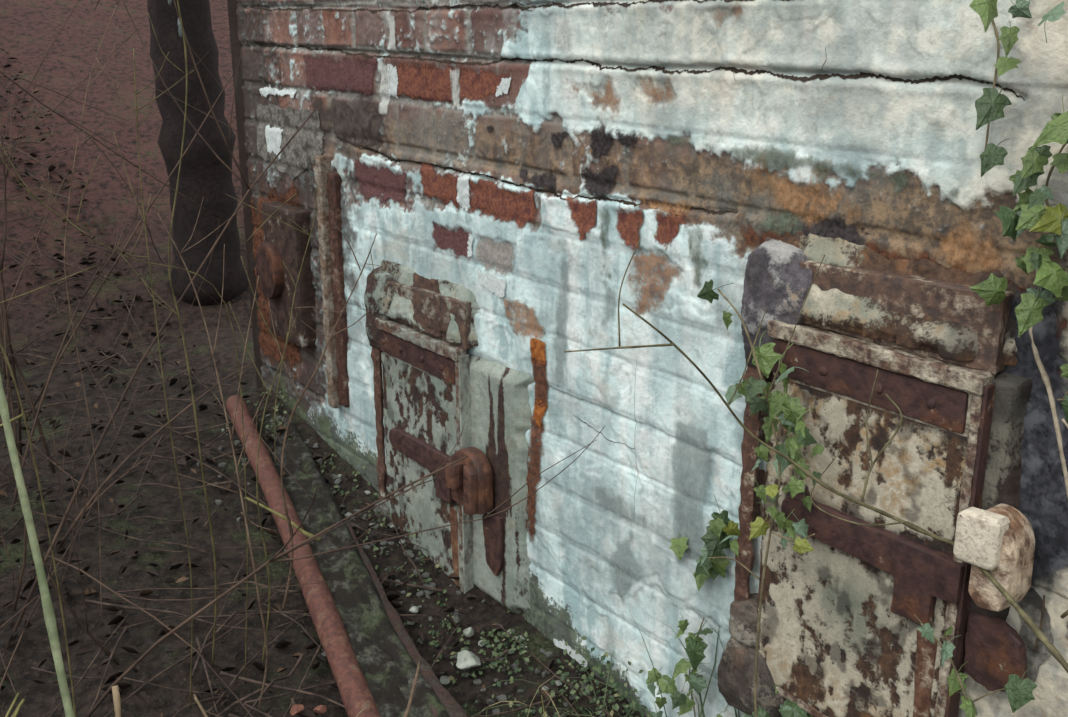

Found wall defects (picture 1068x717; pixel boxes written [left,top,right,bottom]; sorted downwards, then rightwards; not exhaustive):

crack [244,0,753,13]
crack [258,44,1025,101]
flaking render [256,55,511,180]
peeling [419,163,537,229]
flaking render [432,221,545,337]
crack [337,137,737,215]
peeling [565,196,597,240]
peeling [616,208,686,314]
corrosion [737,222,793,247]
corrosion [757,157,840,224]
corrosion [866,227,1000,274]
corrosion [525,338,548,541]